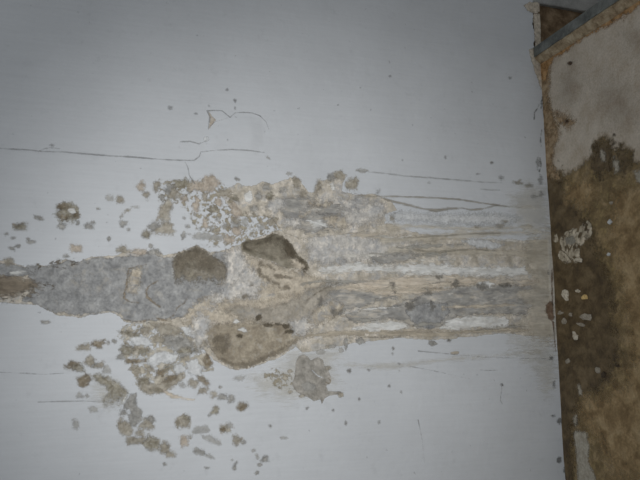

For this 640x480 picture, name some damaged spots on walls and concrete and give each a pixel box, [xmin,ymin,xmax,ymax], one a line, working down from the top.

crack [123,110,261,161]
flaking render [0,169,557,466]
damp [378,196,541,256]
damp [534,136,640,480]